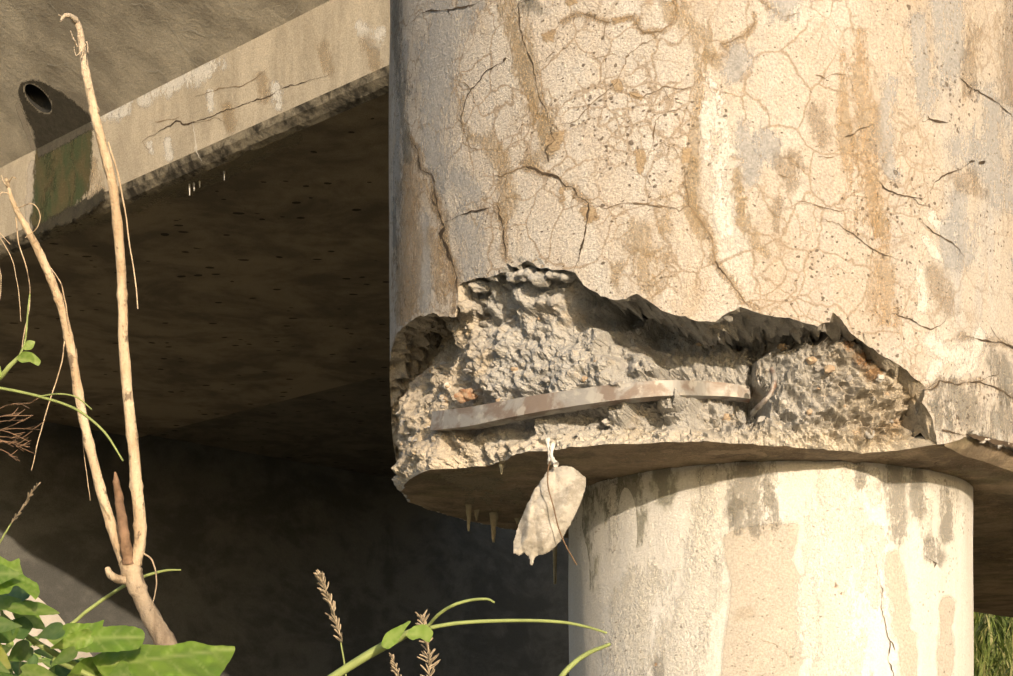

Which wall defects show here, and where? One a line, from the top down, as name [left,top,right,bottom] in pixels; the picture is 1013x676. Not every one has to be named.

water stain [16,58,302,239]
crack [142,68,328,156]
crack [406,0,755,311]
water stain [699,75,778,240]
crack [874,160,986,258]
water stain [913,189,976,313]
corrosion [454,388,478,404]
spalling [389,256,1013,514]
water stain [923,326,986,383]
crack [923,375,1013,398]
crack [966,328,1013,348]
water stain [794,466,887,676]